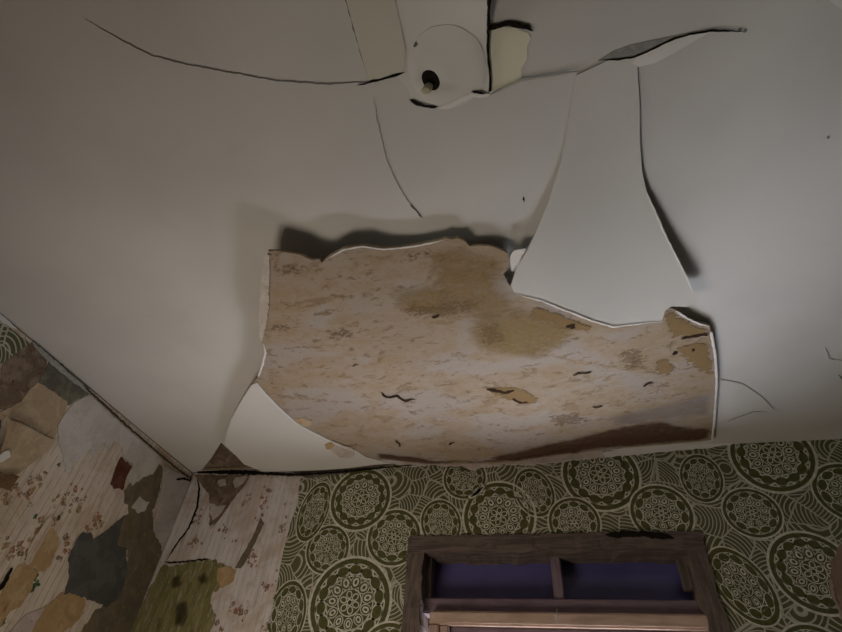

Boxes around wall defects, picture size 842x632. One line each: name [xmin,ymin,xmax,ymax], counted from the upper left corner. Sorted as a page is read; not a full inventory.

crack [87,0,382,85]
crack [598,29,743,61]
crack [409,99,438,108]
peeling [510,248,526,271]
water stain [403,254,565,355]
peeling [531,308,591,331]
peeling [666,312,713,374]
peeling [489,387,538,404]
flaking render [0,343,163,632]
peeling [195,474,250,529]
water stain [130,559,232,632]